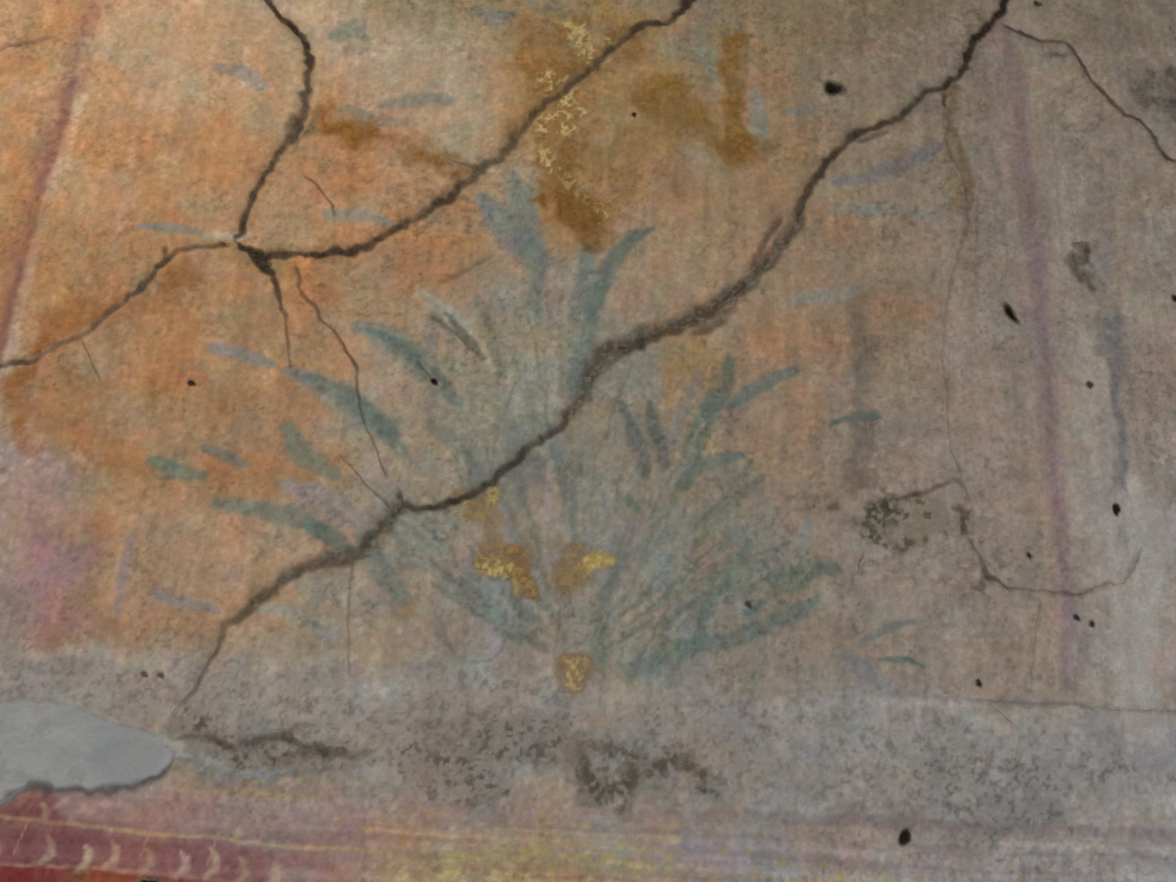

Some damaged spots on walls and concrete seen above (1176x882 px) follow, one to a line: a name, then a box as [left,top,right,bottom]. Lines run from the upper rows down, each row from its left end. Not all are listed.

crack [0,0,694,367]
crack [190,0,1174,695]
spalling [860,493,972,551]